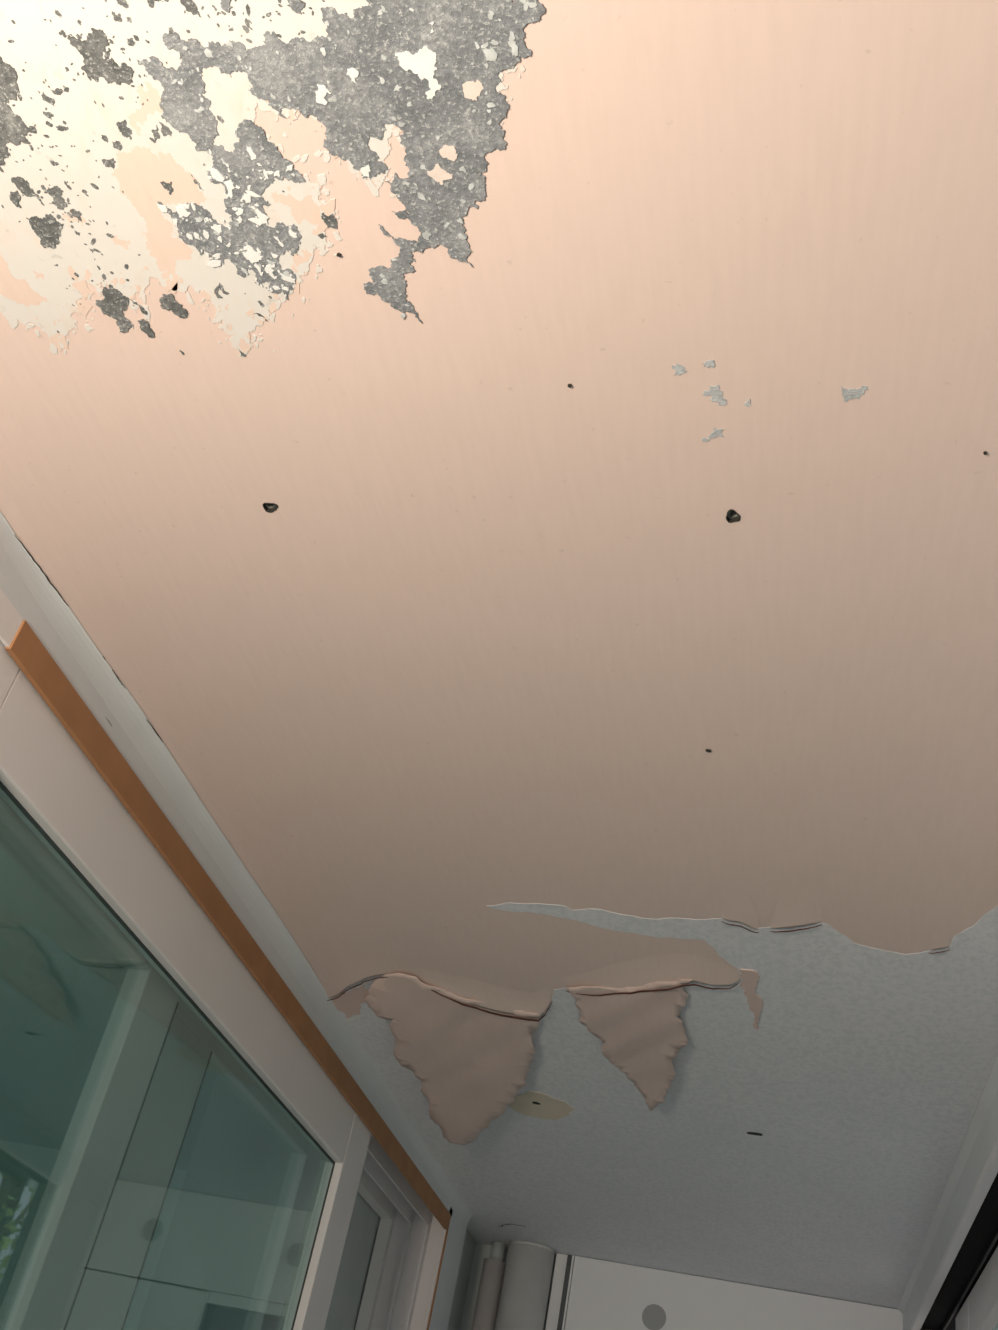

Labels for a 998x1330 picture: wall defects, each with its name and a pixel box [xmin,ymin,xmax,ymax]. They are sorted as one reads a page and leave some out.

peeling [0,0,545,358]
peeling [321,888,998,1309]